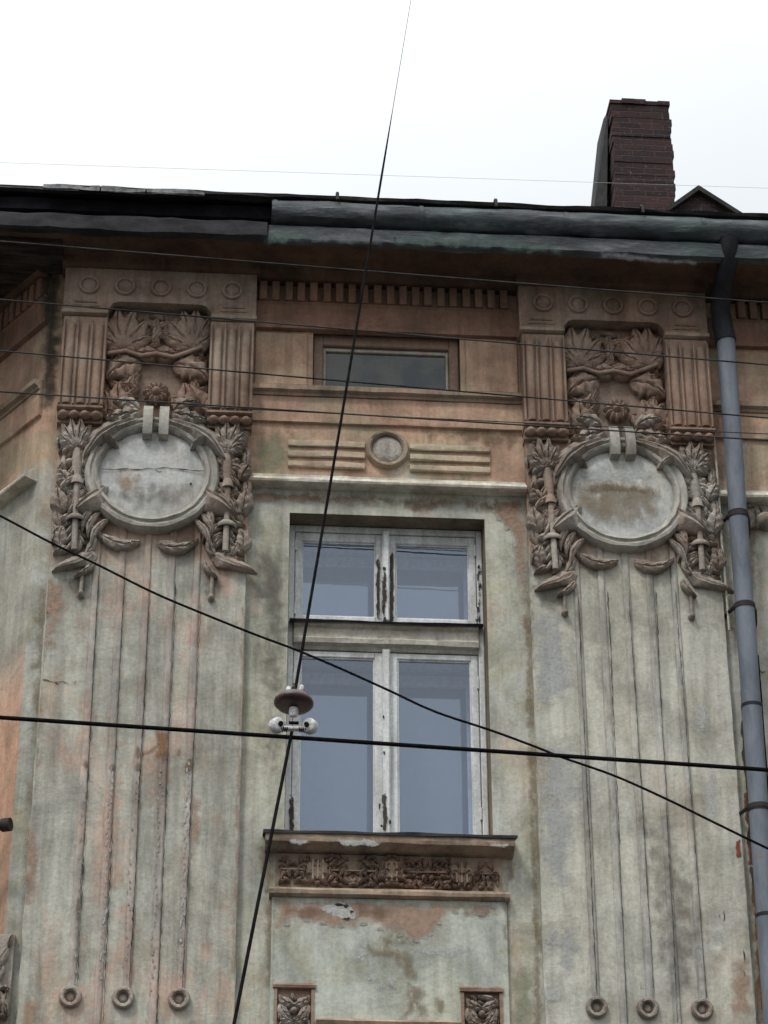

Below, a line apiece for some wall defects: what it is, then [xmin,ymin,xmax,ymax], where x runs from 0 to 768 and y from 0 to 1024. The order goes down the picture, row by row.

crack [106,465,202,473]
damp [579,484,656,521]
peeling [375,552,395,622]
peeling [379,793,392,831]
peeling [279,901,458,943]